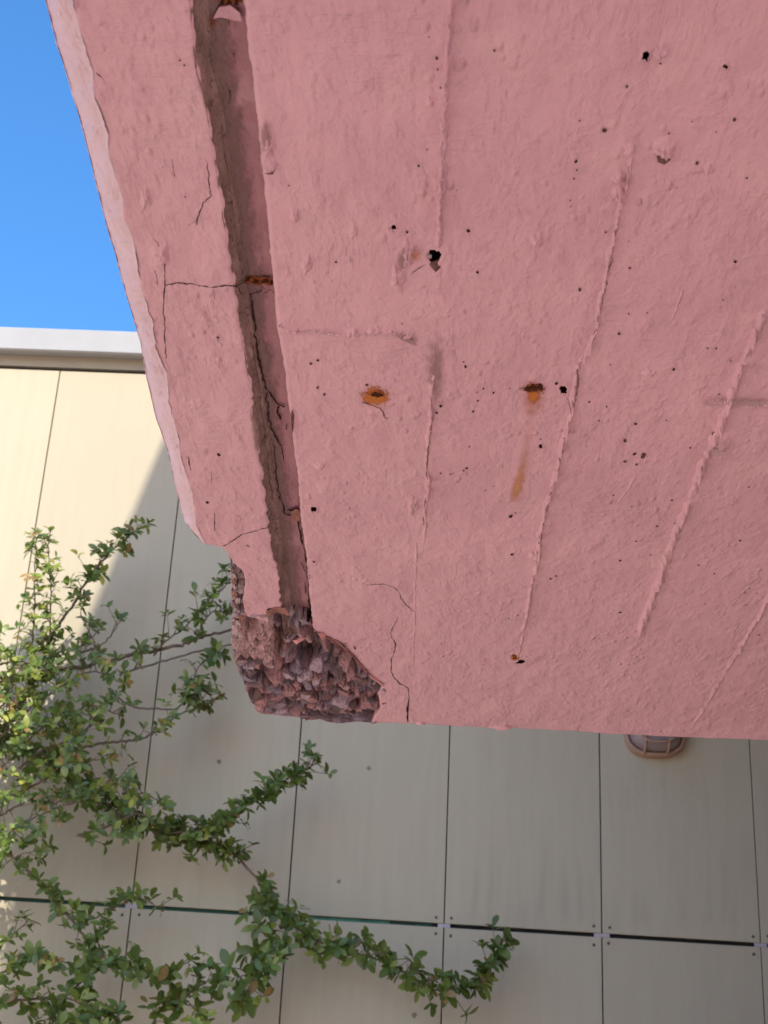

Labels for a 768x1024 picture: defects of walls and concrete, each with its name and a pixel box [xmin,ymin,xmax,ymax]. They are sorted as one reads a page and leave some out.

crack [211,4,242,26]
corrosion [245,276,274,286]
crack [154,90,315,624]
corrosion [361,386,388,405]
corrosion [522,382,545,404]
spalling [230,557,387,724]
crack [366,584,414,722]